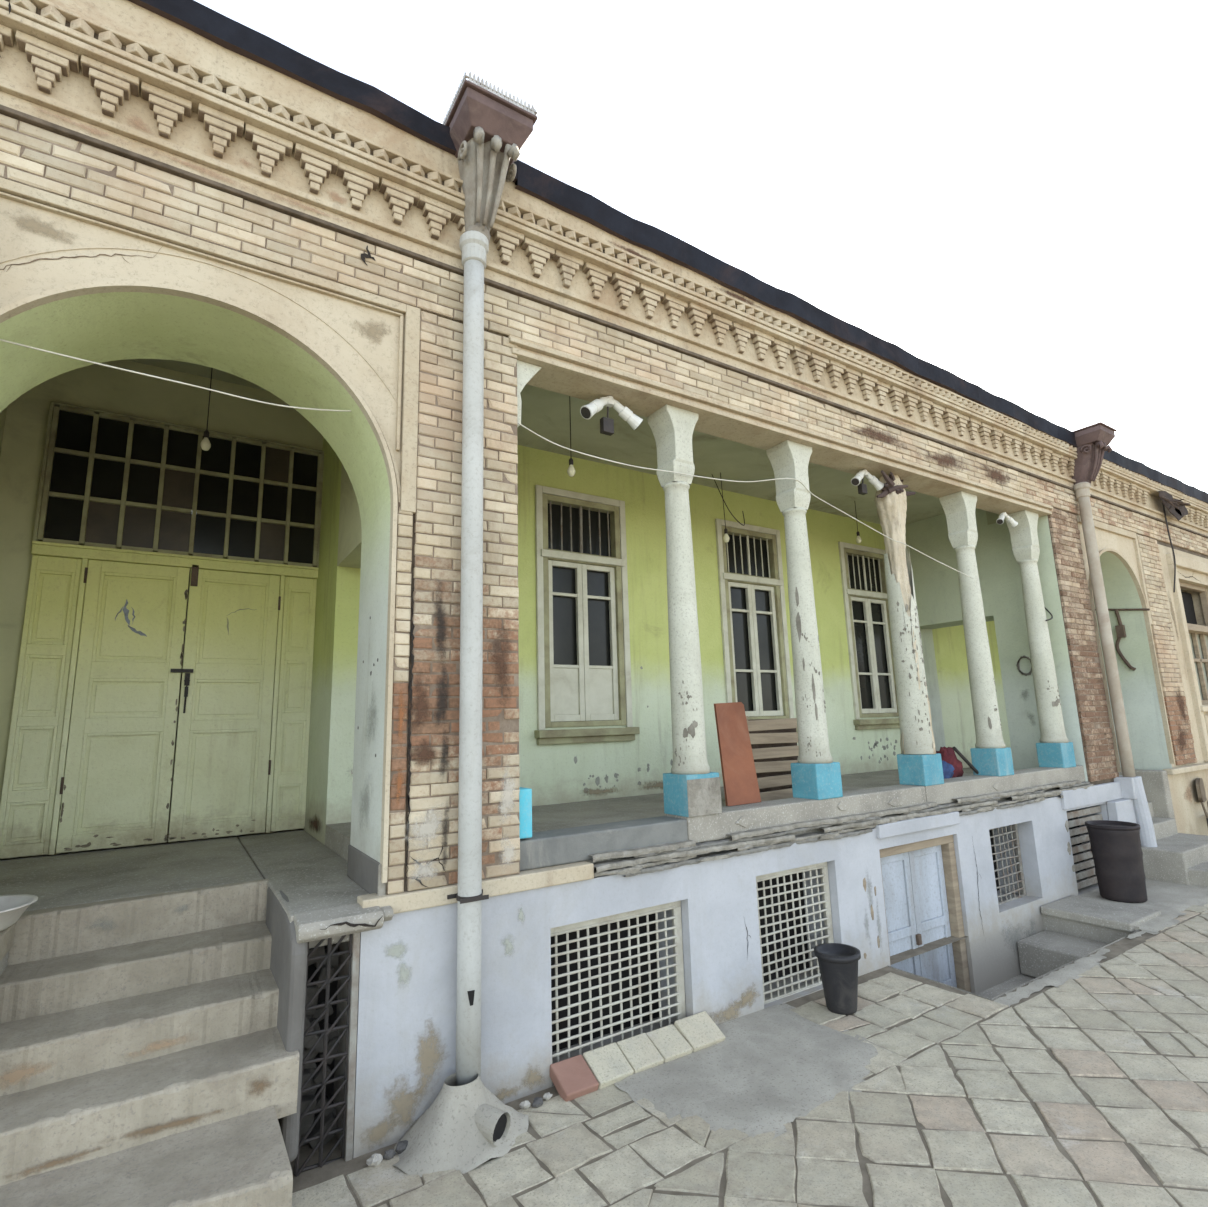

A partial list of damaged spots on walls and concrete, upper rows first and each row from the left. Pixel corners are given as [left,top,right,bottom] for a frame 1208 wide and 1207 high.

crack [0,246,163,272]
peeling [115,599,146,636]
leakage [436,599,446,650]
leakage [412,669,448,725]
leakage [493,631,509,690]
peeling [897,601,933,748]
leakage [411,739,448,773]
peeling [583,773,619,793]
leakage [369,1030,442,1143]